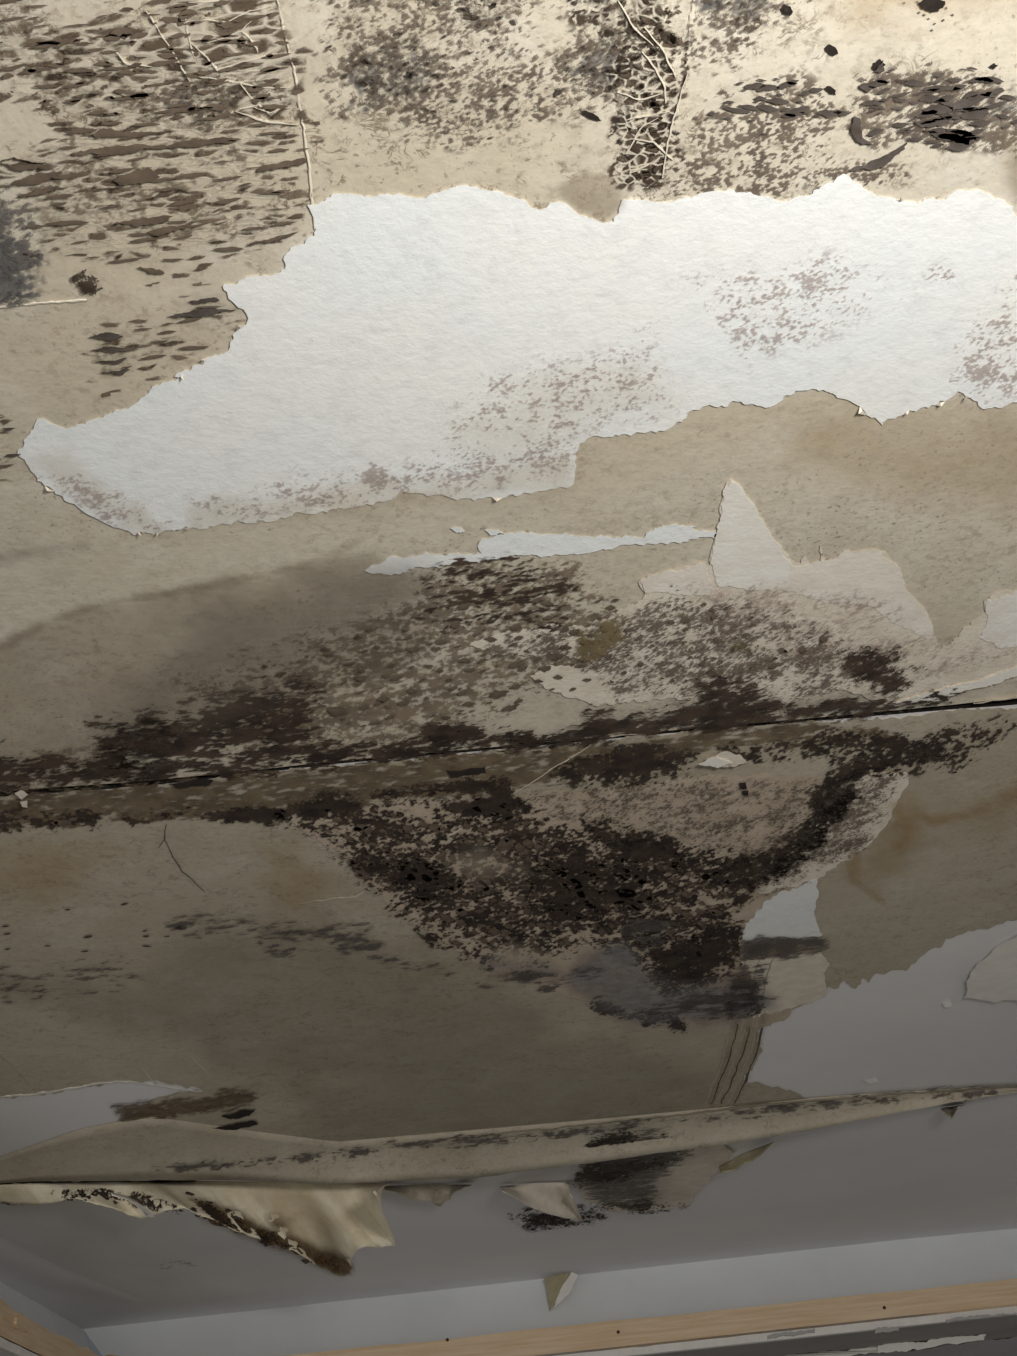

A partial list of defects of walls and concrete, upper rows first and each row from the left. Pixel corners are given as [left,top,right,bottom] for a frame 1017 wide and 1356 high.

water stain [135,70,281,132]
crack [567,0,690,190]
water stain [314,0,1017,198]
water stain [0,185,48,307]
crack [0,0,324,397]
peeling [17,174,1017,536]
peeling [365,479,1017,708]
crack [15,790,29,808]
crack [299,734,640,904]
water stain [0,554,1017,1034]
peeling [742,879,822,942]
peeling [0,1180,472,1277]